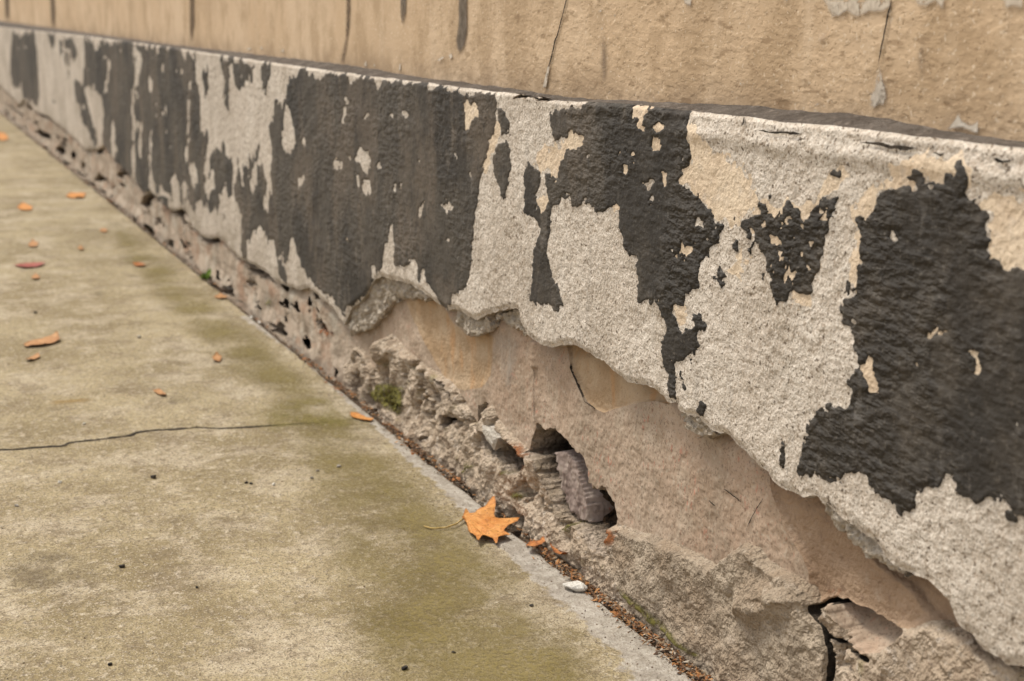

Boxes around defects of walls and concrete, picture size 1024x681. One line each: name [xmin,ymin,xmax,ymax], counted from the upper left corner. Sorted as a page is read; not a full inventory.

crack [544,1,566,88]
crack [878,0,892,64]
peeling [871,73,886,107]
spalling [0,27,564,541]
crack [568,357,595,409]
peeling [447,88,1024,681]
crack [0,418,356,450]
crack [808,597,870,681]